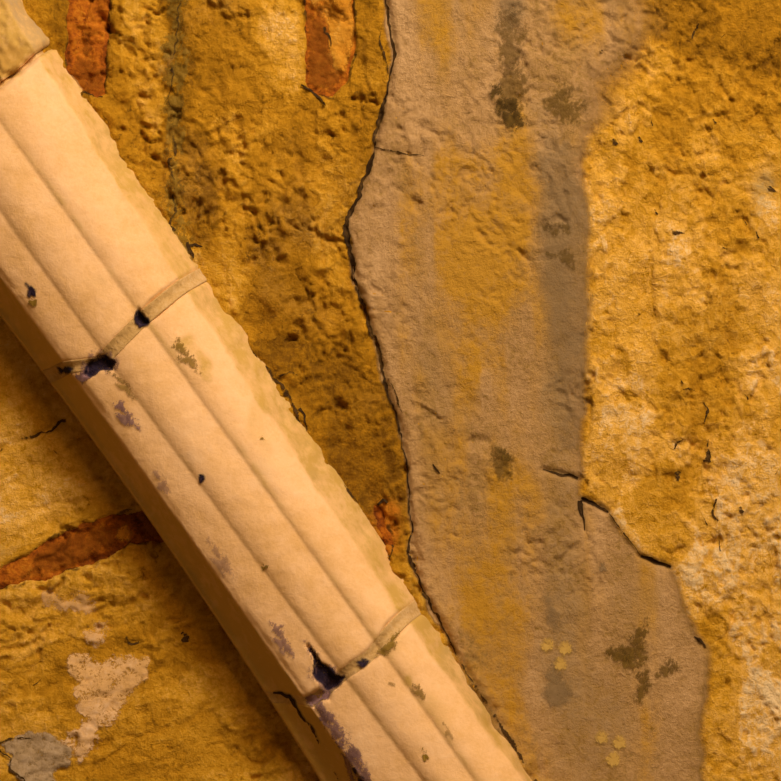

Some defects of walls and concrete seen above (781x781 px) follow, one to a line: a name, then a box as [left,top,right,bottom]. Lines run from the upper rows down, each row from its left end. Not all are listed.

water stain [489,84,527,129]
water stain [543,87,587,123]
flaking render [348,0,710,781]
flaking render [0,509,164,614]
peeling [0,621,150,781]
water stain [605,617,680,703]